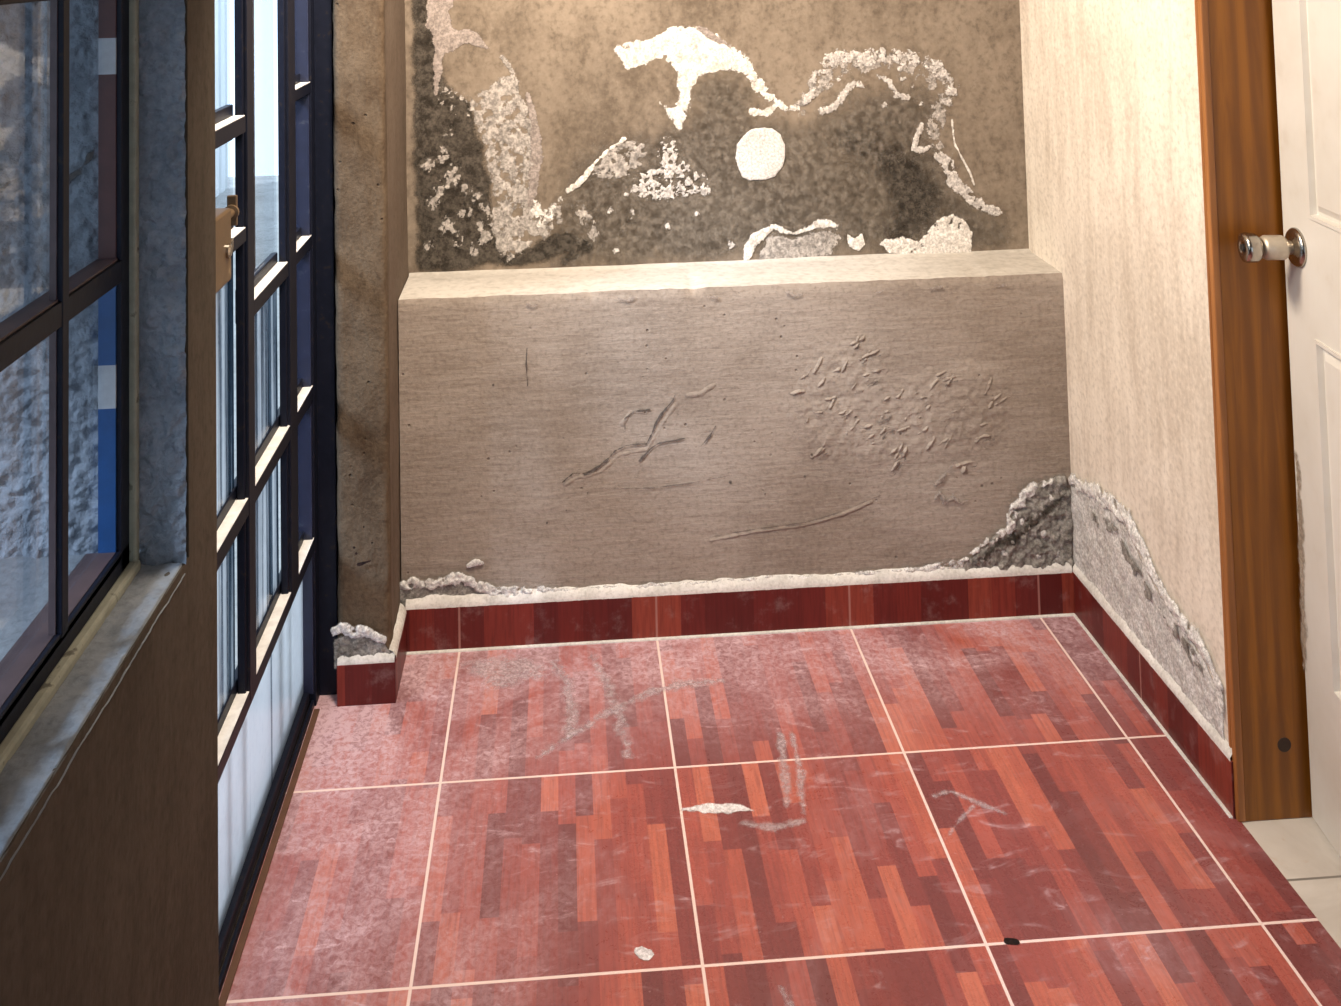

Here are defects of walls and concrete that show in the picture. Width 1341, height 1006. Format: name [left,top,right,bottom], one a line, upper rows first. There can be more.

peeling [614,26,800,129]
peeling [744,214,972,261]
crack [562,383,721,489]
spalling [330,623,392,669]
spalling [400,559,552,607]
spalling [956,474,1224,740]